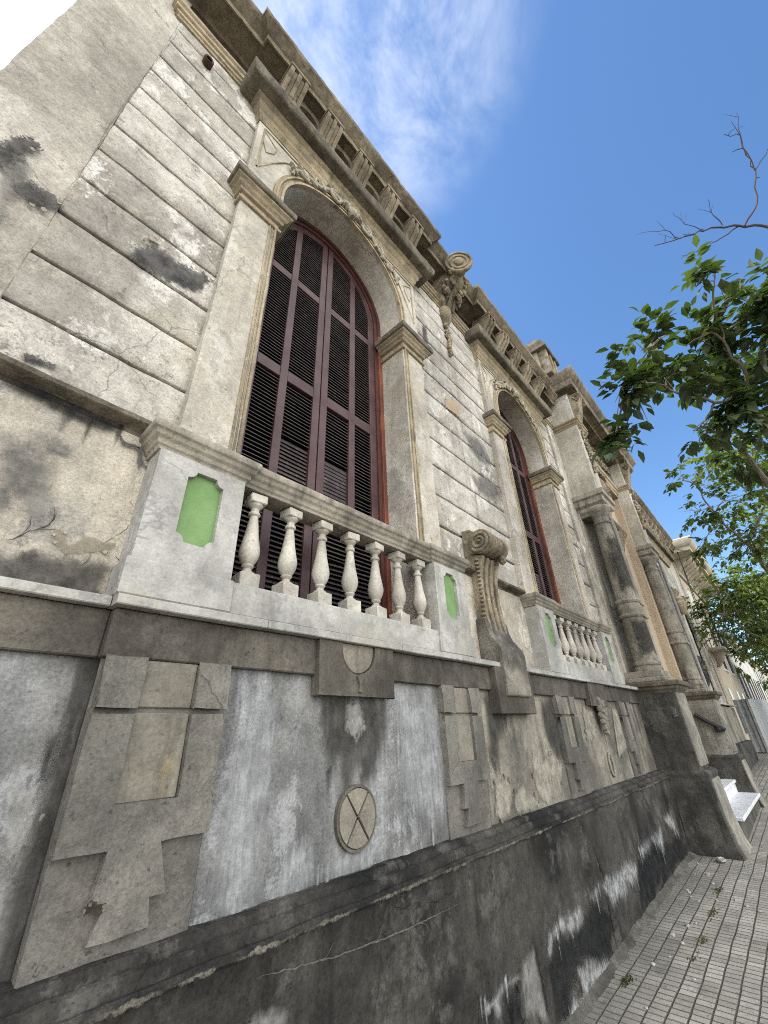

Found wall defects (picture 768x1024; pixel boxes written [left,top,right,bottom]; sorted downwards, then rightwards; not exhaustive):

water stain [0,434,70,515]
water stain [0,550,110,593]
water stain [323,691,443,846]
spalling [82,900,106,917]
crack [261,903,460,977]
water stain [548,814,687,1018]
water stain [480,976,526,1024]